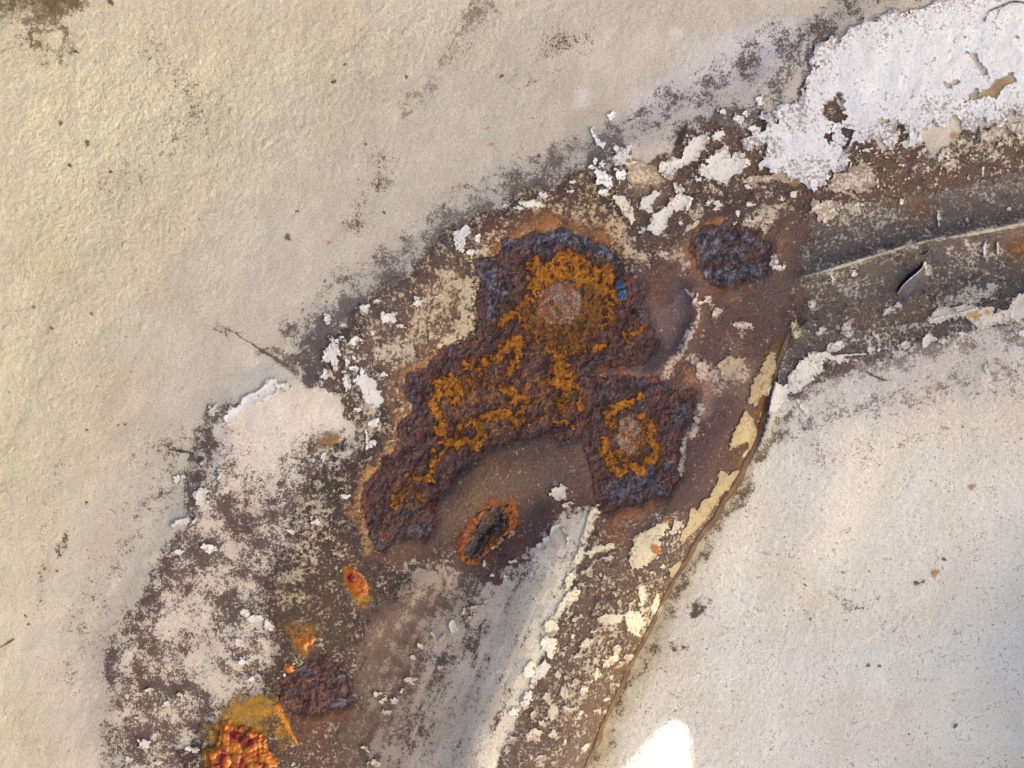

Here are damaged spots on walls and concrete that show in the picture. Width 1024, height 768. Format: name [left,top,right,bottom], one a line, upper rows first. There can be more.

peeling [614,168,627,184]
corrosion [689,217,773,292]
peeling [769,255,786,271]
crack [895,250,933,302]
corrosion [348,210,707,557]
corrosion [341,565,371,608]
corrosion [201,622,352,768]